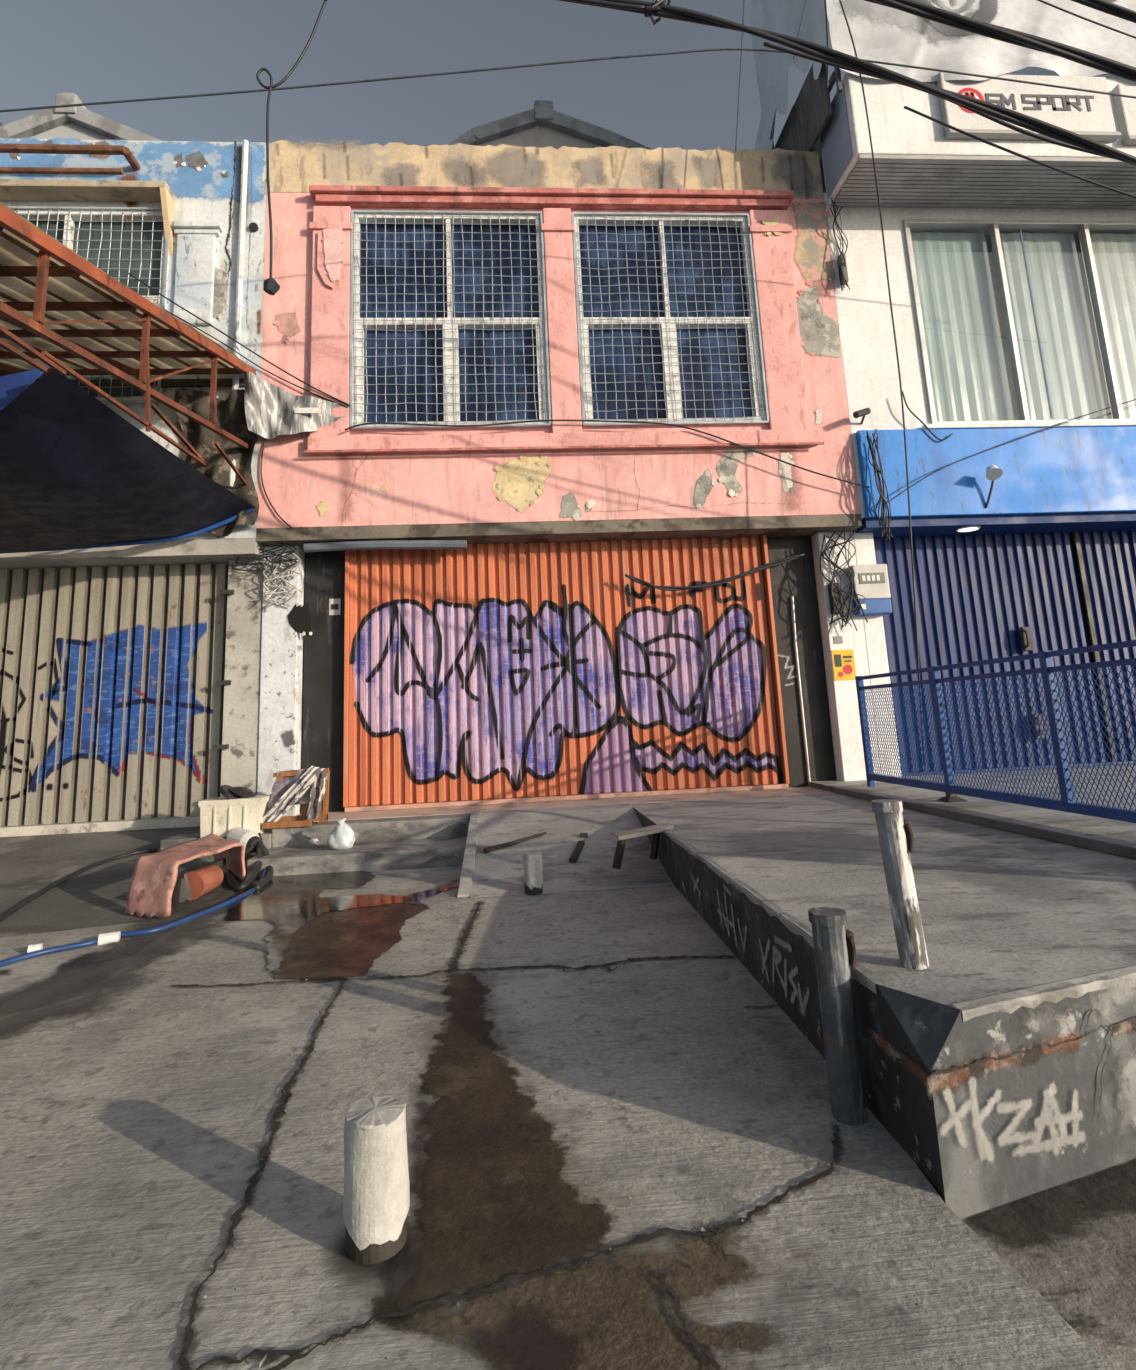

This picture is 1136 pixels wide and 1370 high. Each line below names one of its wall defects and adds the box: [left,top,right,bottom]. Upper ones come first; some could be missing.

peeling [173,151,228,177]
damp [386,164,418,186]
damp [445,150,543,188]
damp [577,158,604,185]
damp [645,161,679,189]
peeling [761,200,840,358]
peeling [492,454,552,513]
peeling [693,447,761,509]
peeling [777,452,795,493]
peeling [559,492,596,521]
crack [172,901,843,1370]
damp [336,972,782,1370]